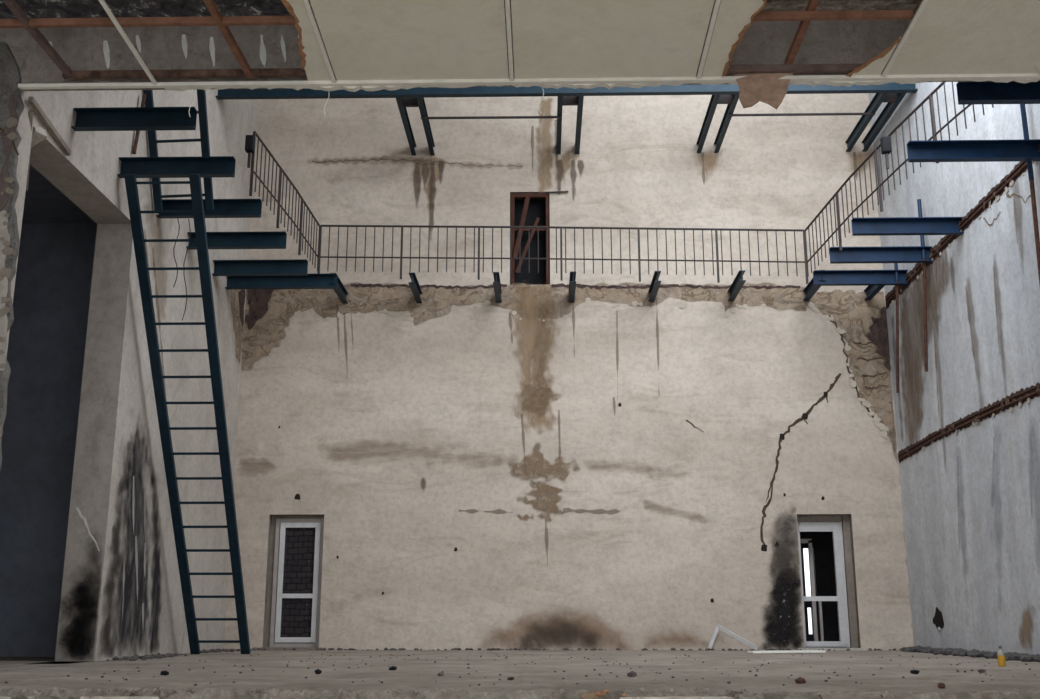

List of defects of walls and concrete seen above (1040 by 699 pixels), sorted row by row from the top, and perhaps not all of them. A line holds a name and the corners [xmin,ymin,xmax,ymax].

flaking render [165,82,738,92]
flaking render [0,95,71,372]
flaking render [231,283,897,452]
rust [885,143,1040,463]
crack [760,373,842,551]
water stain [496,617,625,649]
spalling [933,607,944,631]